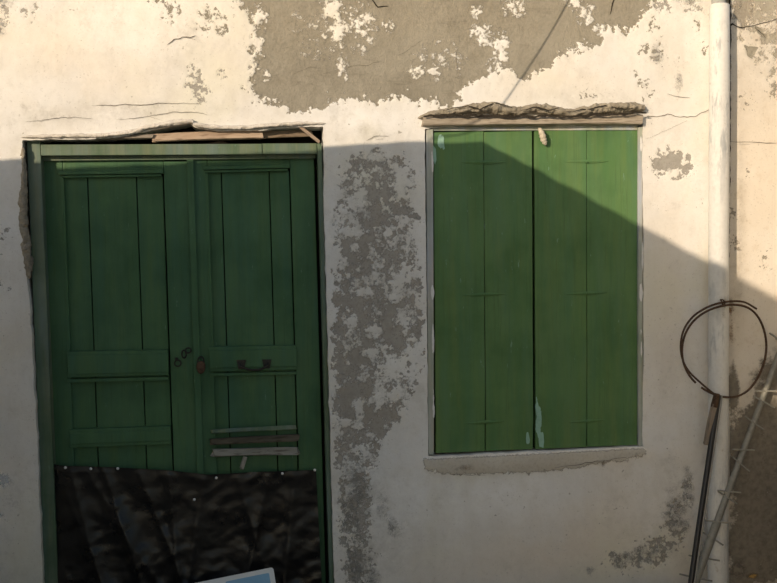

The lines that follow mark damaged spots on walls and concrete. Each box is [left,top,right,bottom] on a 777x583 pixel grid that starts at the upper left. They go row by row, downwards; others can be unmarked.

crack [27,103,206,122]
flaking render [18,0,671,279]
flaking render [640,137,694,180]
crack [729,0,776,183]
flaking render [730,0,777,62]
flaking render [330,147,434,583]